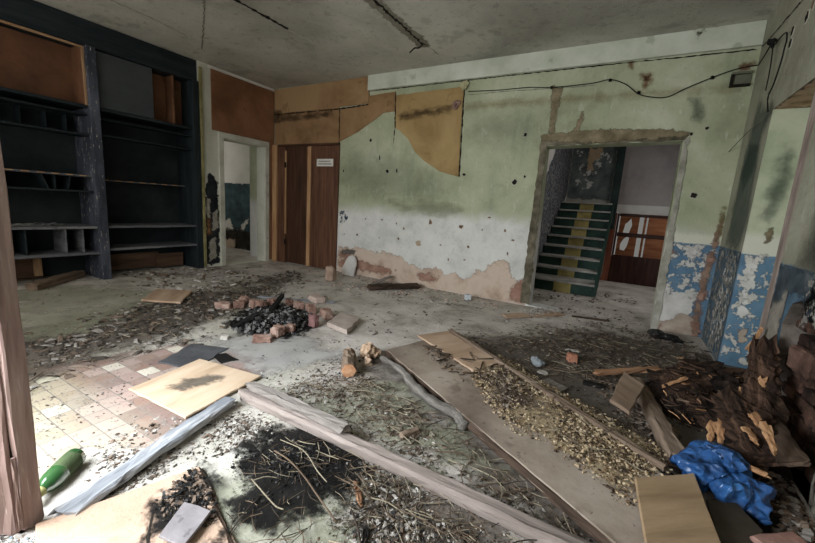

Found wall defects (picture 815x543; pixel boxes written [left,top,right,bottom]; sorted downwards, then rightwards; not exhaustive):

crack [111,0,206,49]
crack [234,0,288,30]
crack [279,0,802,177]
peeling [205,172,250,266]
flaking render [336,246,525,305]
peeling [655,242,815,366]